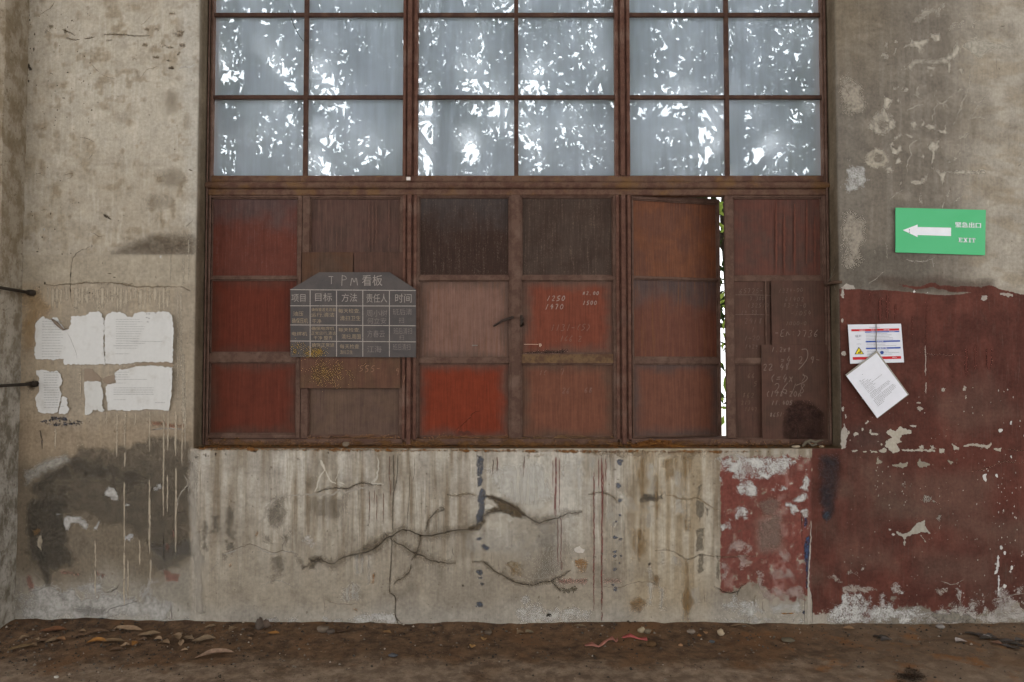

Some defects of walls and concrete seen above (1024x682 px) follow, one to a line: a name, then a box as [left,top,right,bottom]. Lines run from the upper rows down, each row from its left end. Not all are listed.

damp [24,240,191,620]
peeling [840,407,1001,468]
rust [198,431,829,519]
peeling [719,454,810,531]
crack [225,456,616,623]
peeling [896,515,941,546]
rust [684,564,693,615]
peeling [721,540,805,601]
peeling [830,567,903,608]
damp [826,593,1024,624]
spalling [932,587,1021,623]